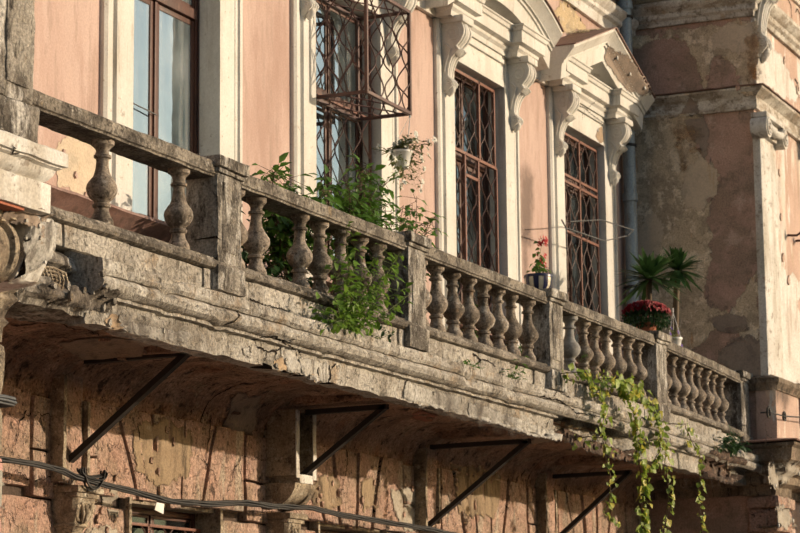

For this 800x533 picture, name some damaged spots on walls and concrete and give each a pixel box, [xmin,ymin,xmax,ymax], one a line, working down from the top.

spalling [554,0,604,35]
peeling [605,17,800,103]
spalling [1,206,190,361]
peeling [635,113,760,351]
peeling [779,250,800,383]
peeling [768,459,800,490]